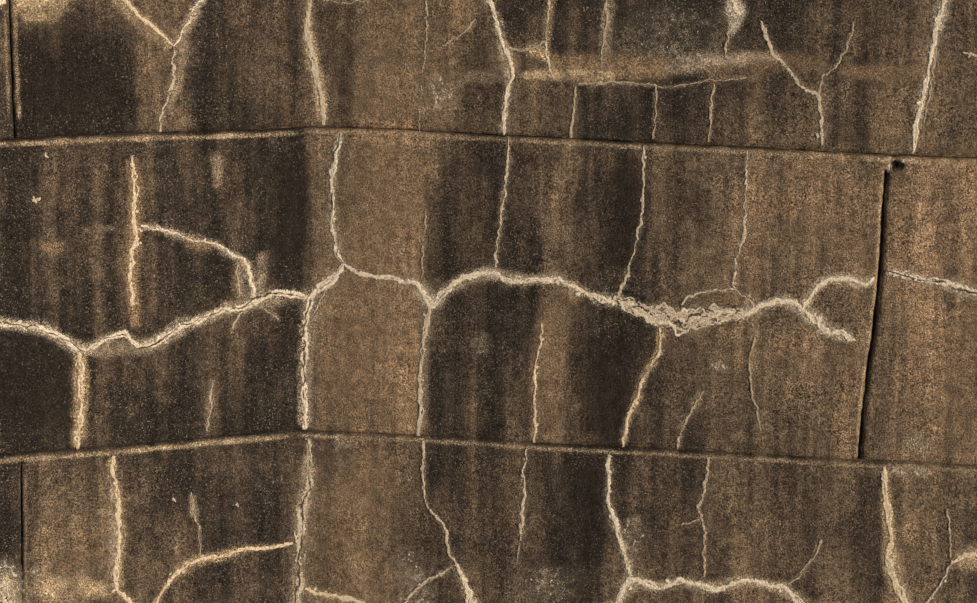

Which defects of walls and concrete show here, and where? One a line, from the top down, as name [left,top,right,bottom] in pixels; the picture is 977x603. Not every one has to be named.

damp [367,13,452,109]
damp [521,31,782,82]
crack [911,0,946,154]
damp [212,156,221,185]
crack [0,0,874,449]
crack [517,324,544,560]
damp [33,568,108,601]
crack [109,456,133,603]
crack [153,438,365,603]
crack [404,441,477,603]
crack [605,455,823,603]
crack [881,467,977,603]